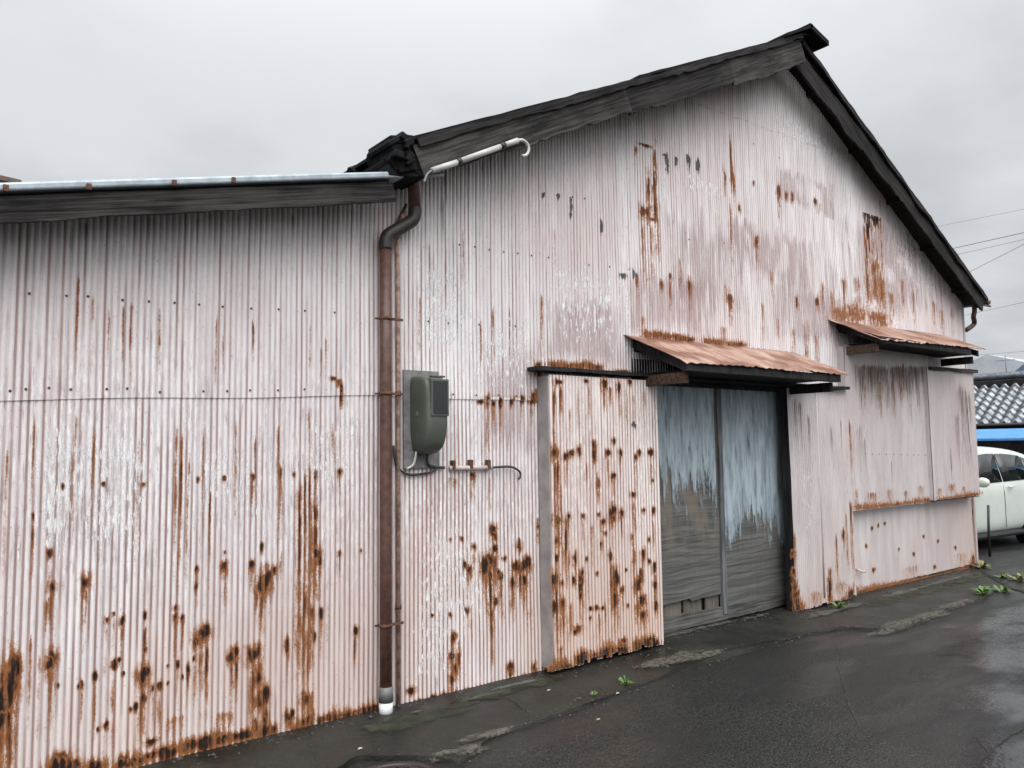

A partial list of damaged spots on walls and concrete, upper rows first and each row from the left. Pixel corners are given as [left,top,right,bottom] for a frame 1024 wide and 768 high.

rust [634,143,692,311]
rust [724,141,741,270]
rust [815,212,915,327]
rust [330,376,344,407]
rust [40,427,379,768]
rust [449,359,662,678]
rust [791,484,980,611]
rust [0,636,60,768]